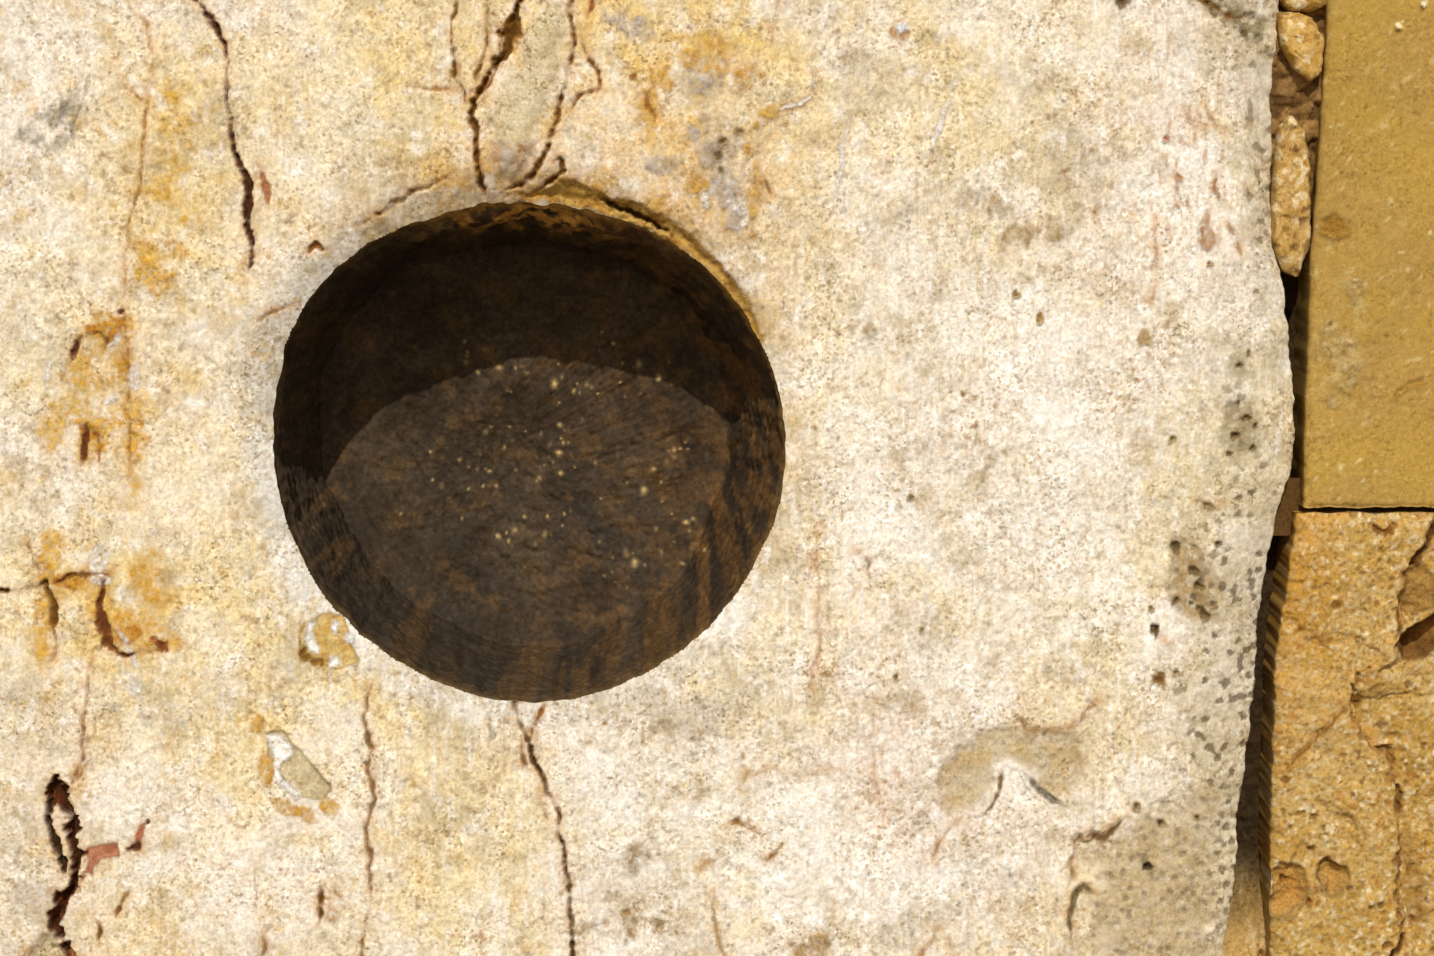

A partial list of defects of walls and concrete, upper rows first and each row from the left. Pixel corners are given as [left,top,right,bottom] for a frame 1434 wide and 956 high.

crack [195,0,271,268]
crack [424,0,601,193]
crack [308,241,324,253]
crack [376,180,440,215]
crack [0,545,168,657]
crack [45,678,128,956]
spalling [252,714,338,821]
crack [488,702,575,956]
crack [1287,708,1393,768]
crack [1390,844,1420,956]